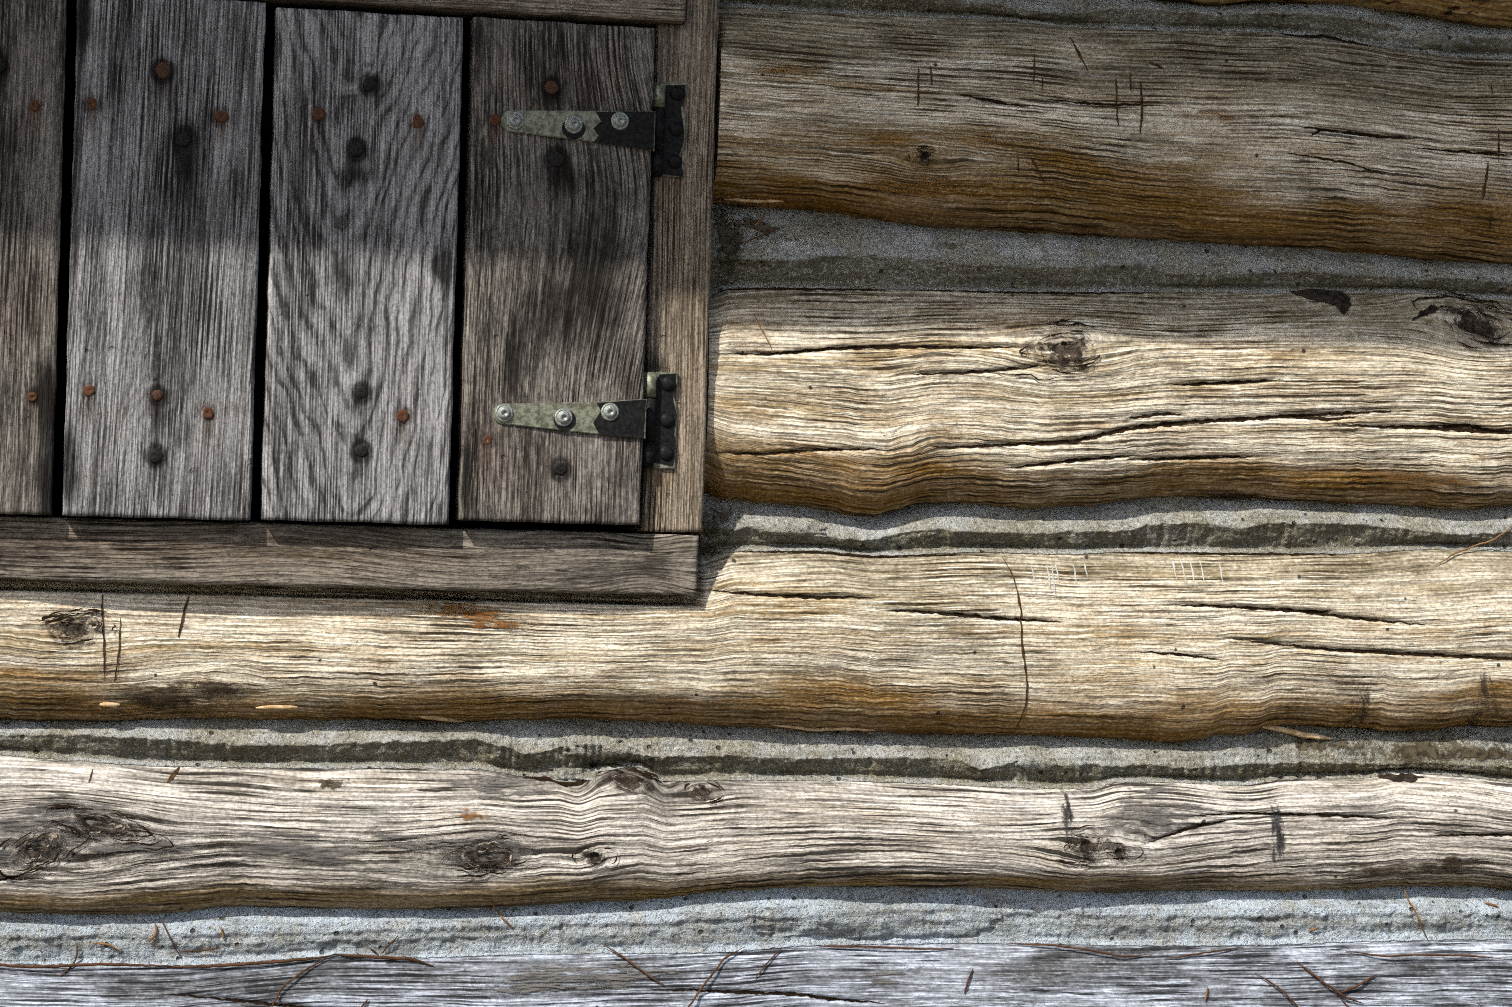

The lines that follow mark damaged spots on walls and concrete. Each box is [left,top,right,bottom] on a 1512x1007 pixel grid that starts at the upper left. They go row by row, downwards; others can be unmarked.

crack [710,379,1512,469]
rust [425,594,523,630]